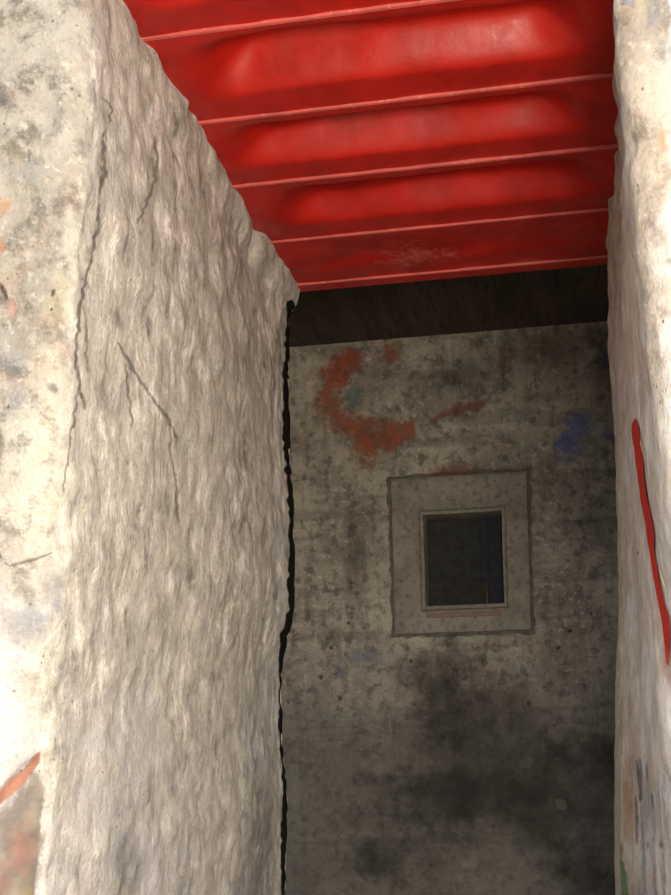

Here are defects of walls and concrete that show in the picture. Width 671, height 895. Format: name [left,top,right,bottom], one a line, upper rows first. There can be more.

crack [278,300,295,895]